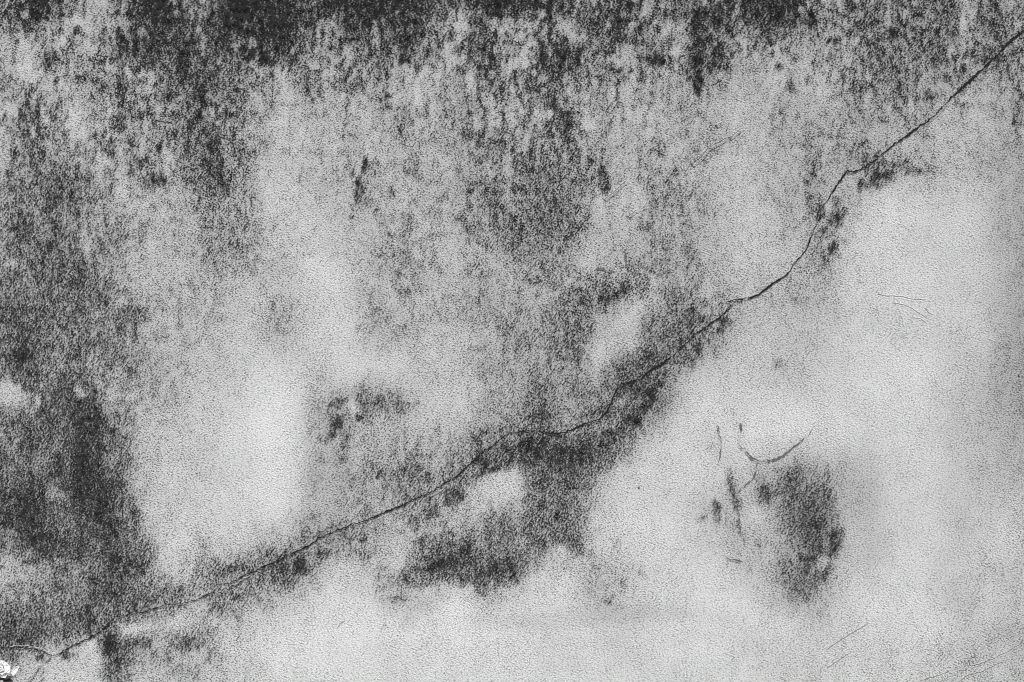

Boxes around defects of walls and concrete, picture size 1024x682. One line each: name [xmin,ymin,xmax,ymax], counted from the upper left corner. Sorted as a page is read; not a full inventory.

water stain [338,154,386,221]
water stain [376,213,442,306]
water stain [638,162,698,275]
crack [540,30,1024,435]
water stain [804,128,849,273]
water stain [317,383,414,462]
crack [0,430,533,682]
water stain [701,470,742,528]
crack [710,423,813,562]
water stain [756,466,845,602]